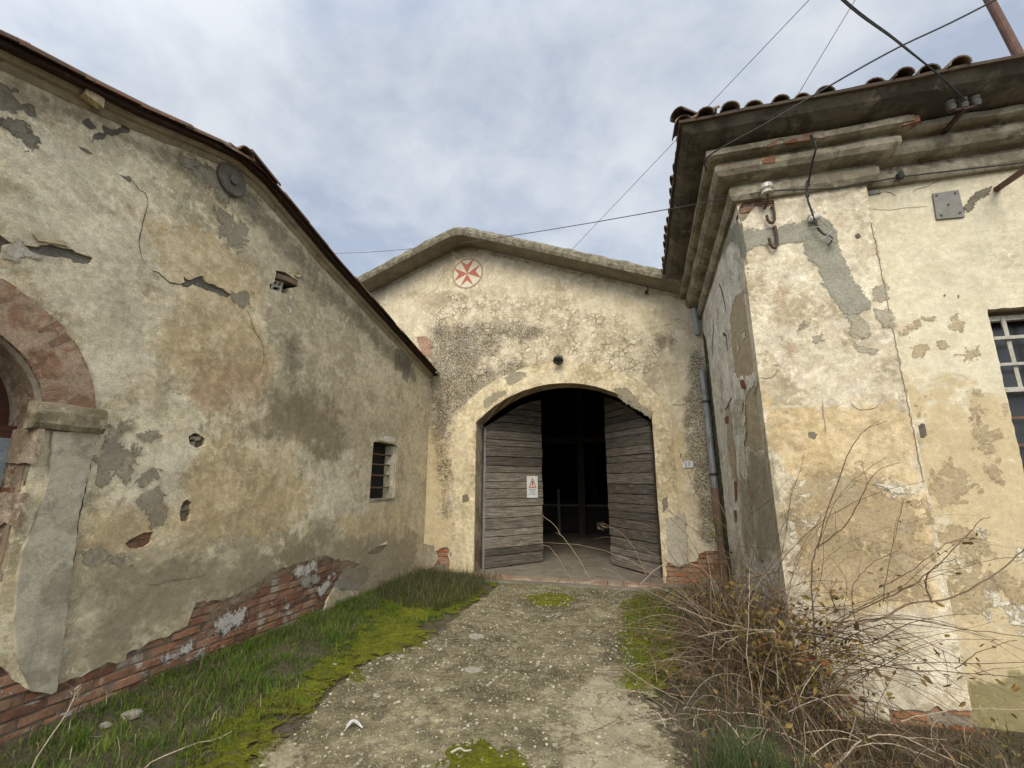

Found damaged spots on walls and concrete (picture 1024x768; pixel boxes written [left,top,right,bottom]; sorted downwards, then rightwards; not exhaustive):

flaking render [0,82,42,152]
flaking render [79,118,129,154]
flaking render [23,233,91,264]
crack [128,179,187,287]
crack [870,181,939,483]
flaking render [0,463,30,493]
flaking render [81,418,190,567]
flaking render [189,434,202,448]
water stain [431,319,540,517]
flaking render [662,497,727,601]
flaking render [0,541,388,742]